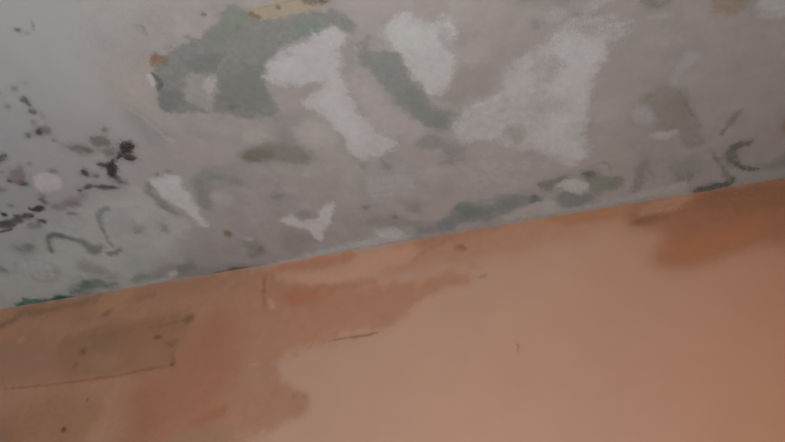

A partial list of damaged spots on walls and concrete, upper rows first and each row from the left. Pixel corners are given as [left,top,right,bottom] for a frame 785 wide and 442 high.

flaking render [143,0,358,121]
water stain [0,0,785,350]